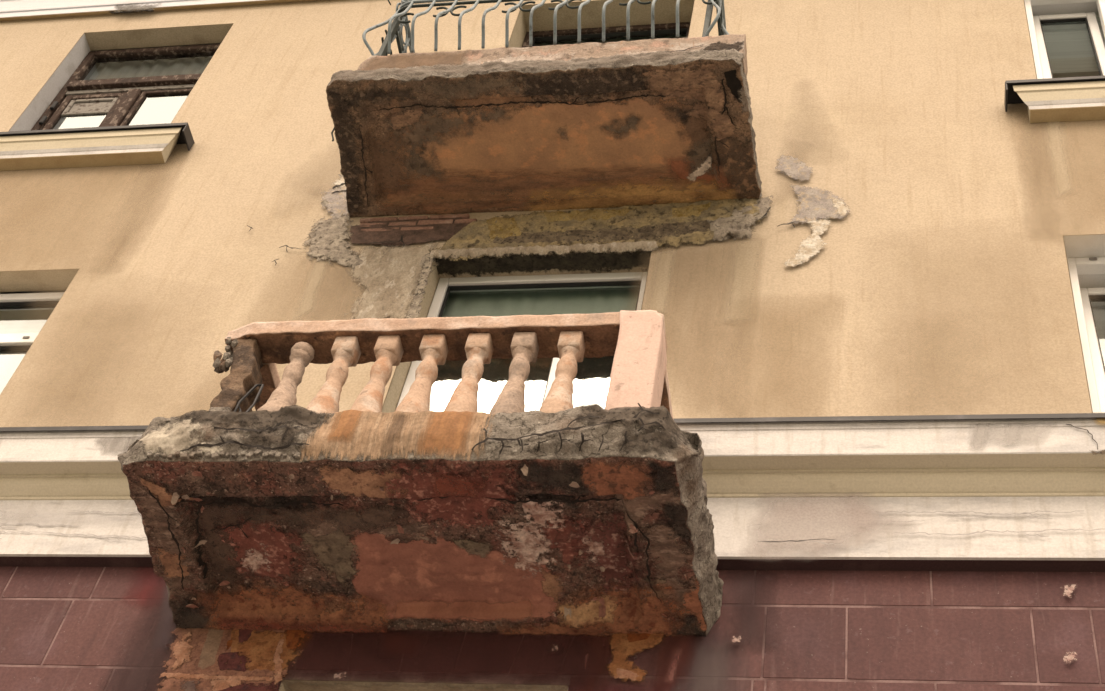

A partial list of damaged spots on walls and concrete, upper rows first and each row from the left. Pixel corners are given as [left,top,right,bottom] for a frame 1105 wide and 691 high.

water stain [327,52,685,214]
spalling [302,174,773,319]
water stain [530,100,761,211]
crack [708,79,735,177]
peeling [775,155,850,267]
spalling [140,405,327,459]
crack [471,403,663,455]
peeling [130,478,207,608]
crack [0,490,343,590]
peeling [219,403,707,631]
peeling [156,627,311,691]
peeling [607,631,664,682]